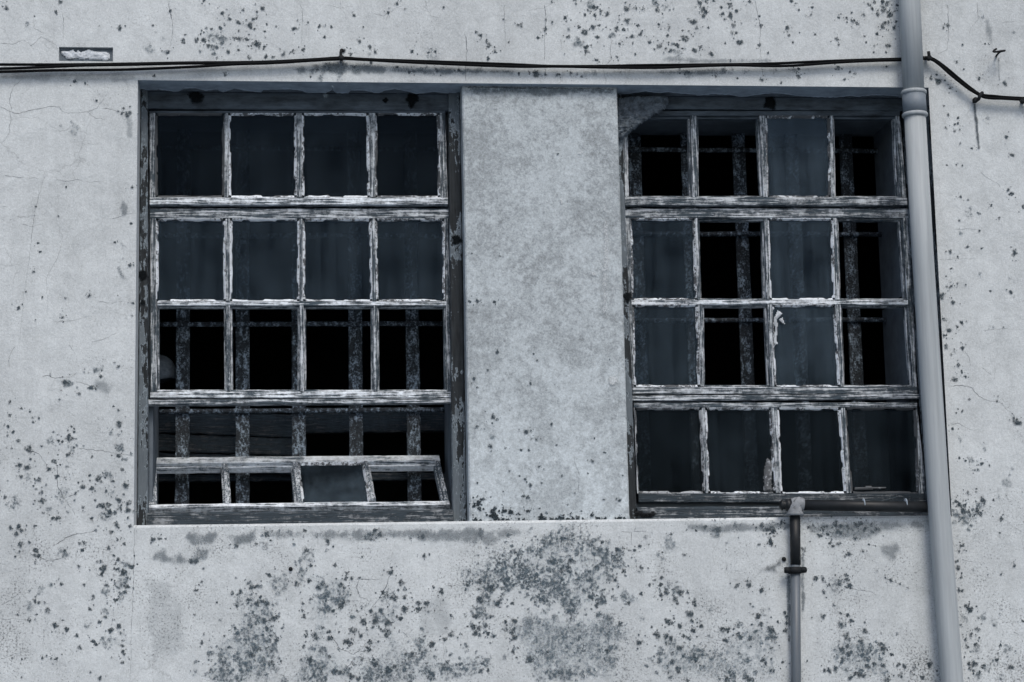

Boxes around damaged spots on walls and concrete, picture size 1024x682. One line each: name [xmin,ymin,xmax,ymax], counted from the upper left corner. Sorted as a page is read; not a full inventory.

mould [3,398,138,664]
leakage [150,532,216,596]
leakage [190,489,938,682]